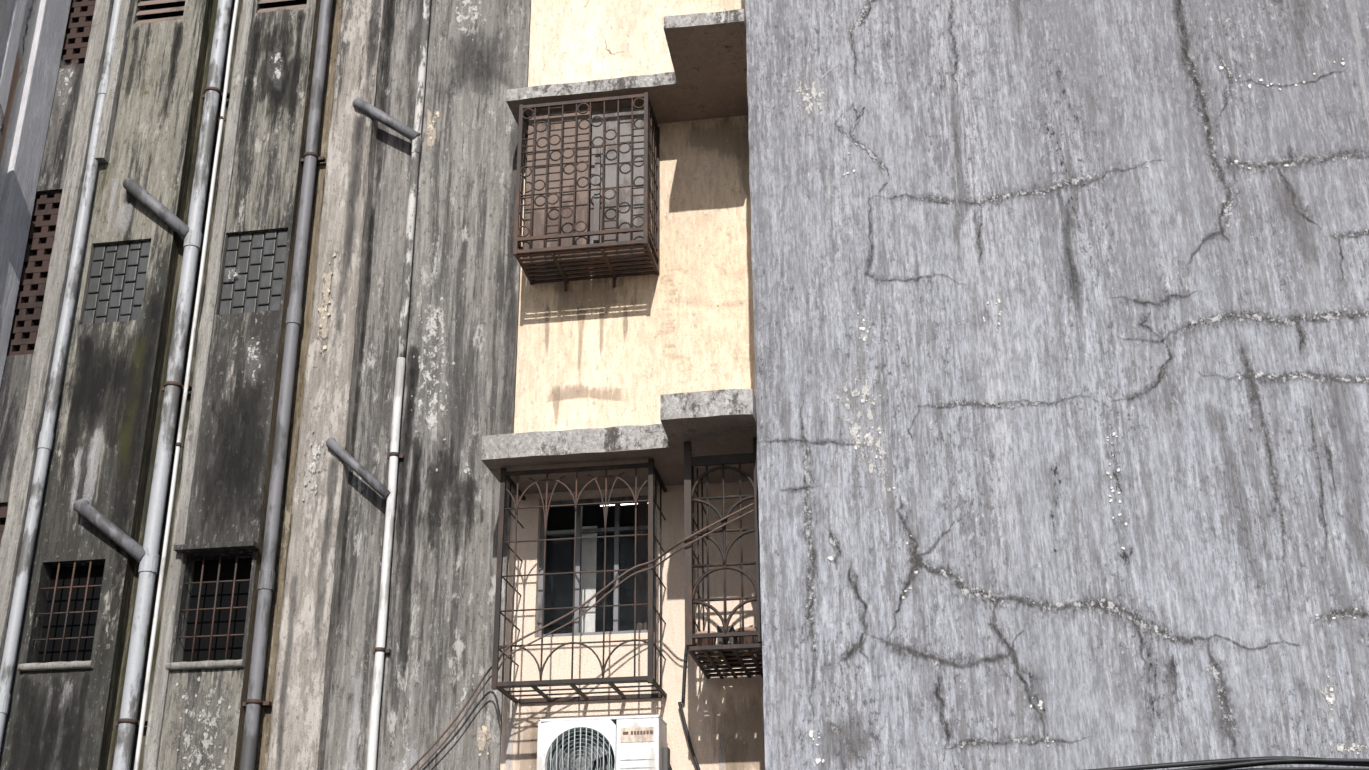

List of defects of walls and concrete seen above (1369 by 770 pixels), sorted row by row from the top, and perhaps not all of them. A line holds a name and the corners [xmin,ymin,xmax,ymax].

water stain [164,22,183,118]
water stain [239,10,305,155]
water stain [373,0,395,112]
crack [834,0,875,71]
crack [838,107,1148,281]
crack [1126,40,1369,551]
water stain [62,288,165,753]
water stain [202,373,265,531]
water stain [326,206,375,609]
crack [908,395,1081,441]
crack [768,423,1369,765]
water stain [8,671,90,770]